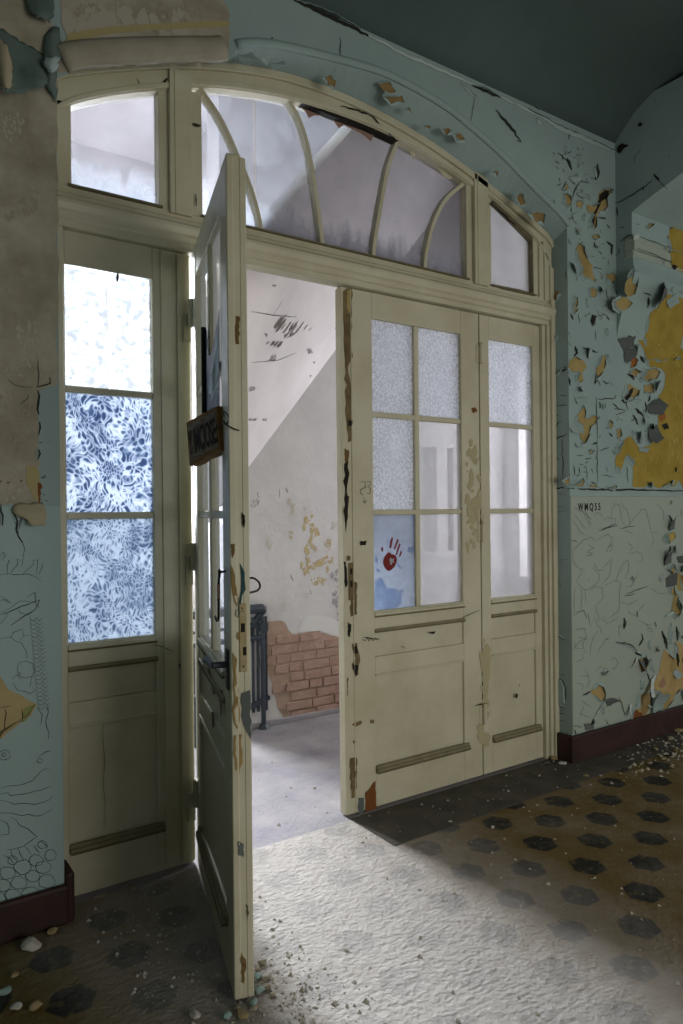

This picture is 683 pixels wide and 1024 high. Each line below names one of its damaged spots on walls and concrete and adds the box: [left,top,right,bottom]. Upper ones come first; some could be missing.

peeling [0,0,53,56]
peeling [377,80,412,114]
peeling [0,80,59,505]
crack [9,369,51,443]
peeling [554,160,683,619]
crack [0,504,23,543]
peeling [0,677,36,739]
flaking render [267,621,339,717]
peeling [591,641,683,719]